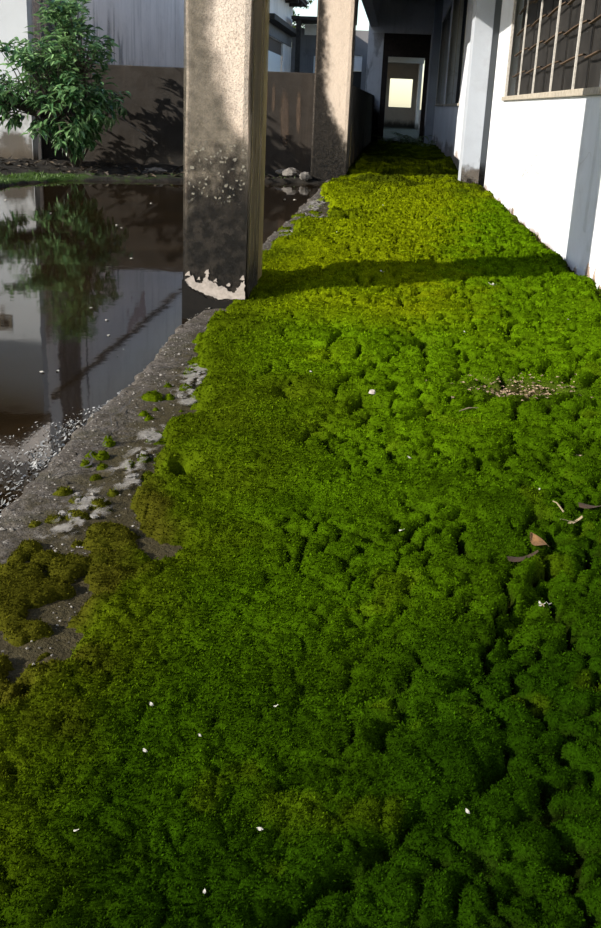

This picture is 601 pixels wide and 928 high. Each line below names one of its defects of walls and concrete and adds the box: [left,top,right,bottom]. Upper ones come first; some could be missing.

leakage [168,0,258,319]
leakage [267,87,300,144]
leakage [310,0,359,181]
spalling [185,269,245,300]